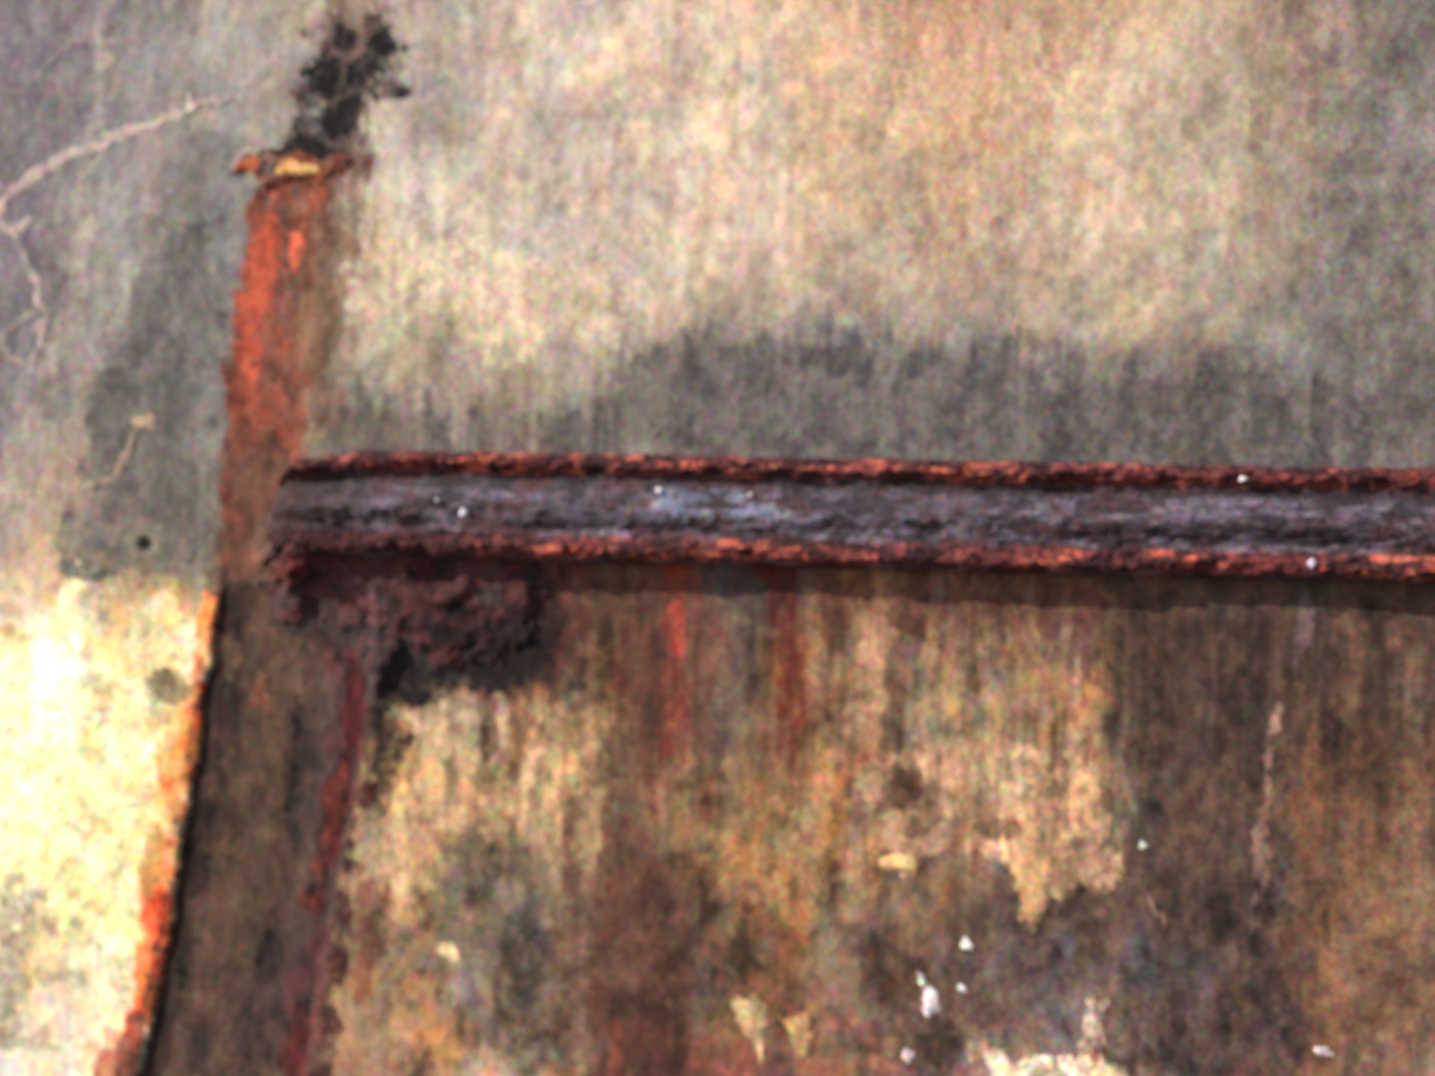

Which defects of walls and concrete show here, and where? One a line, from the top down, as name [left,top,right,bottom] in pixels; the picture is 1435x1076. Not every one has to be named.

crack [0,89,244,378]
corrosion [180,108,382,667]
leakage [274,0,418,153]
leakage [312,0,1435,468]
corrosion [87,709,186,1076]
corrosion [277,997,312,1076]
corrosion [296,672,362,912]
corrosion [349,876,390,1011]
leakage [261,561,584,1076]
corrosion [476,562,1137,1076]
leakage [721,576,1435,1076]